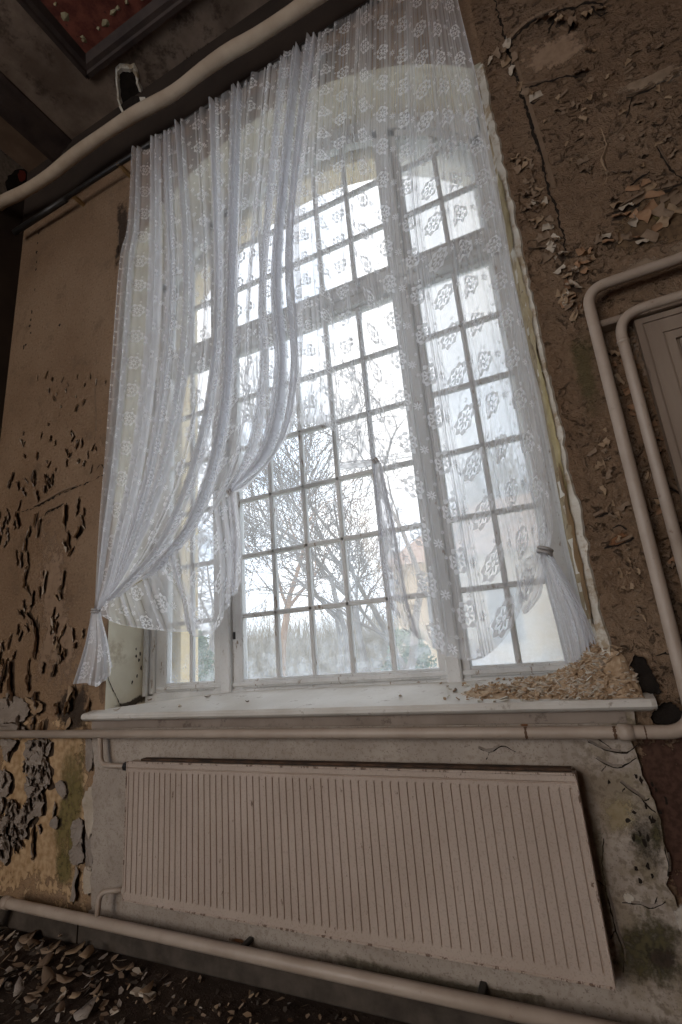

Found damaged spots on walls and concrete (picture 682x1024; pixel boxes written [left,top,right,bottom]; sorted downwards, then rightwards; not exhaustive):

crack [493,0,608,251]
flaking render [474,6,682,655]
peeling [0,422,104,913]
spalling [628,654,682,725]
flaking render [639,738,682,930]